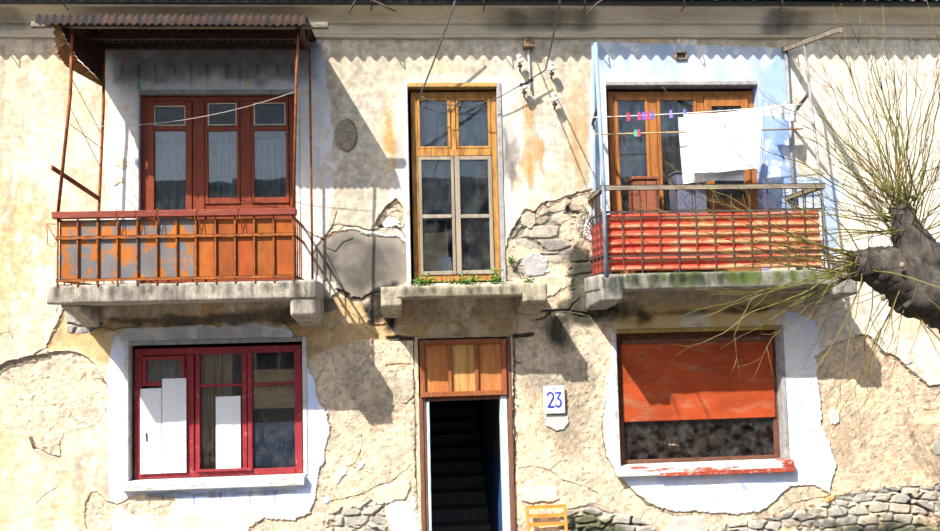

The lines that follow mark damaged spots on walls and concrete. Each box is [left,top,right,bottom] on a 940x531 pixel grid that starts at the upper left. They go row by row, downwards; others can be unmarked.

spalling [0,310,225,454]
spalling [85,491,176,531]
crack [331,289,418,513]
flaking render [249,188,940,531]